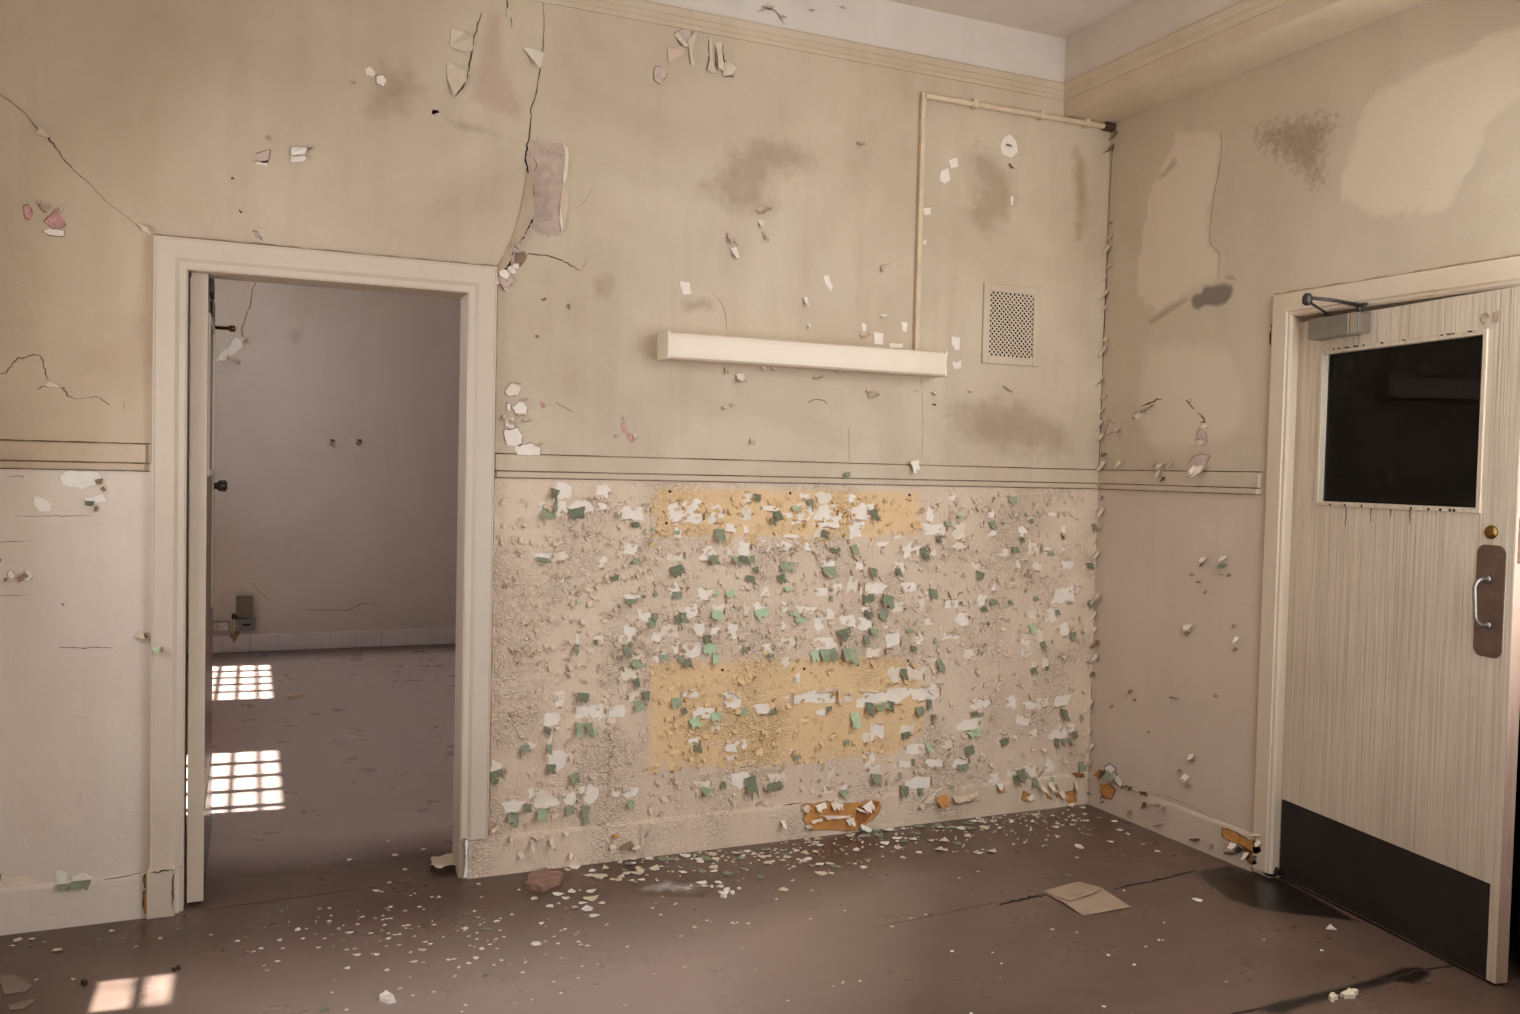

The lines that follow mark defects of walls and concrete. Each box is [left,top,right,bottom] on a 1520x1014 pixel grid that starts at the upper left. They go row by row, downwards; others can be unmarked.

peeling [653,29,736,84]
peeling [446,3,569,292]
water stain [679,120,832,233]
water stain [1145,95,1352,329]
crack [0,0,1262,836]
peeling [1148,400,1210,482]
peeling [489,131,1165,890]
peeling [1177,754,1194,788]
peeling [1189,828,1262,865]